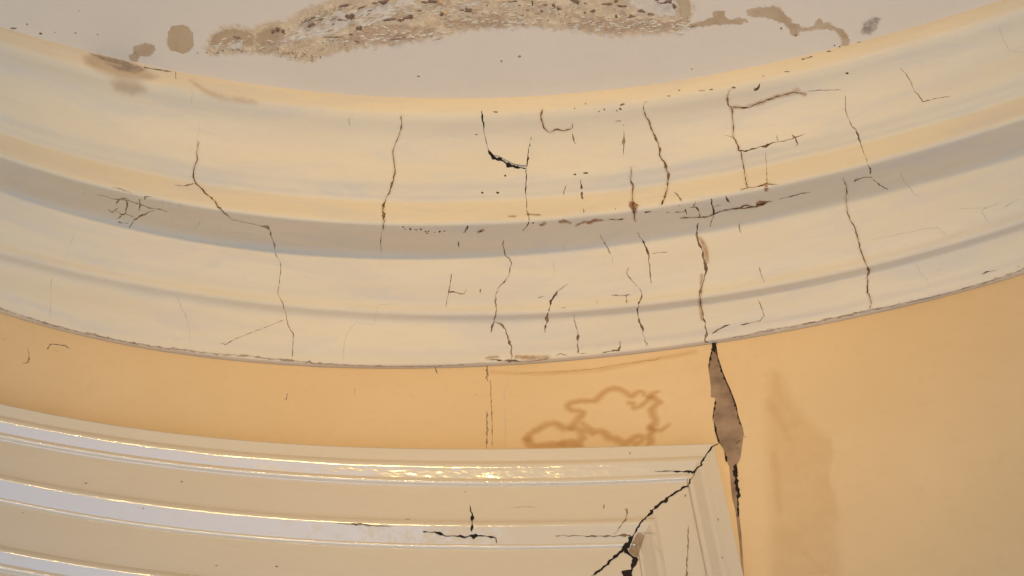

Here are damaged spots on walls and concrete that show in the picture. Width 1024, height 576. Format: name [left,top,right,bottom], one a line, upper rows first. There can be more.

peeling [197,0,696,61]
crack [900,68,950,102]
crack [0,84,1024,449]
crack [423,507,497,543]
crack [559,443,741,576]